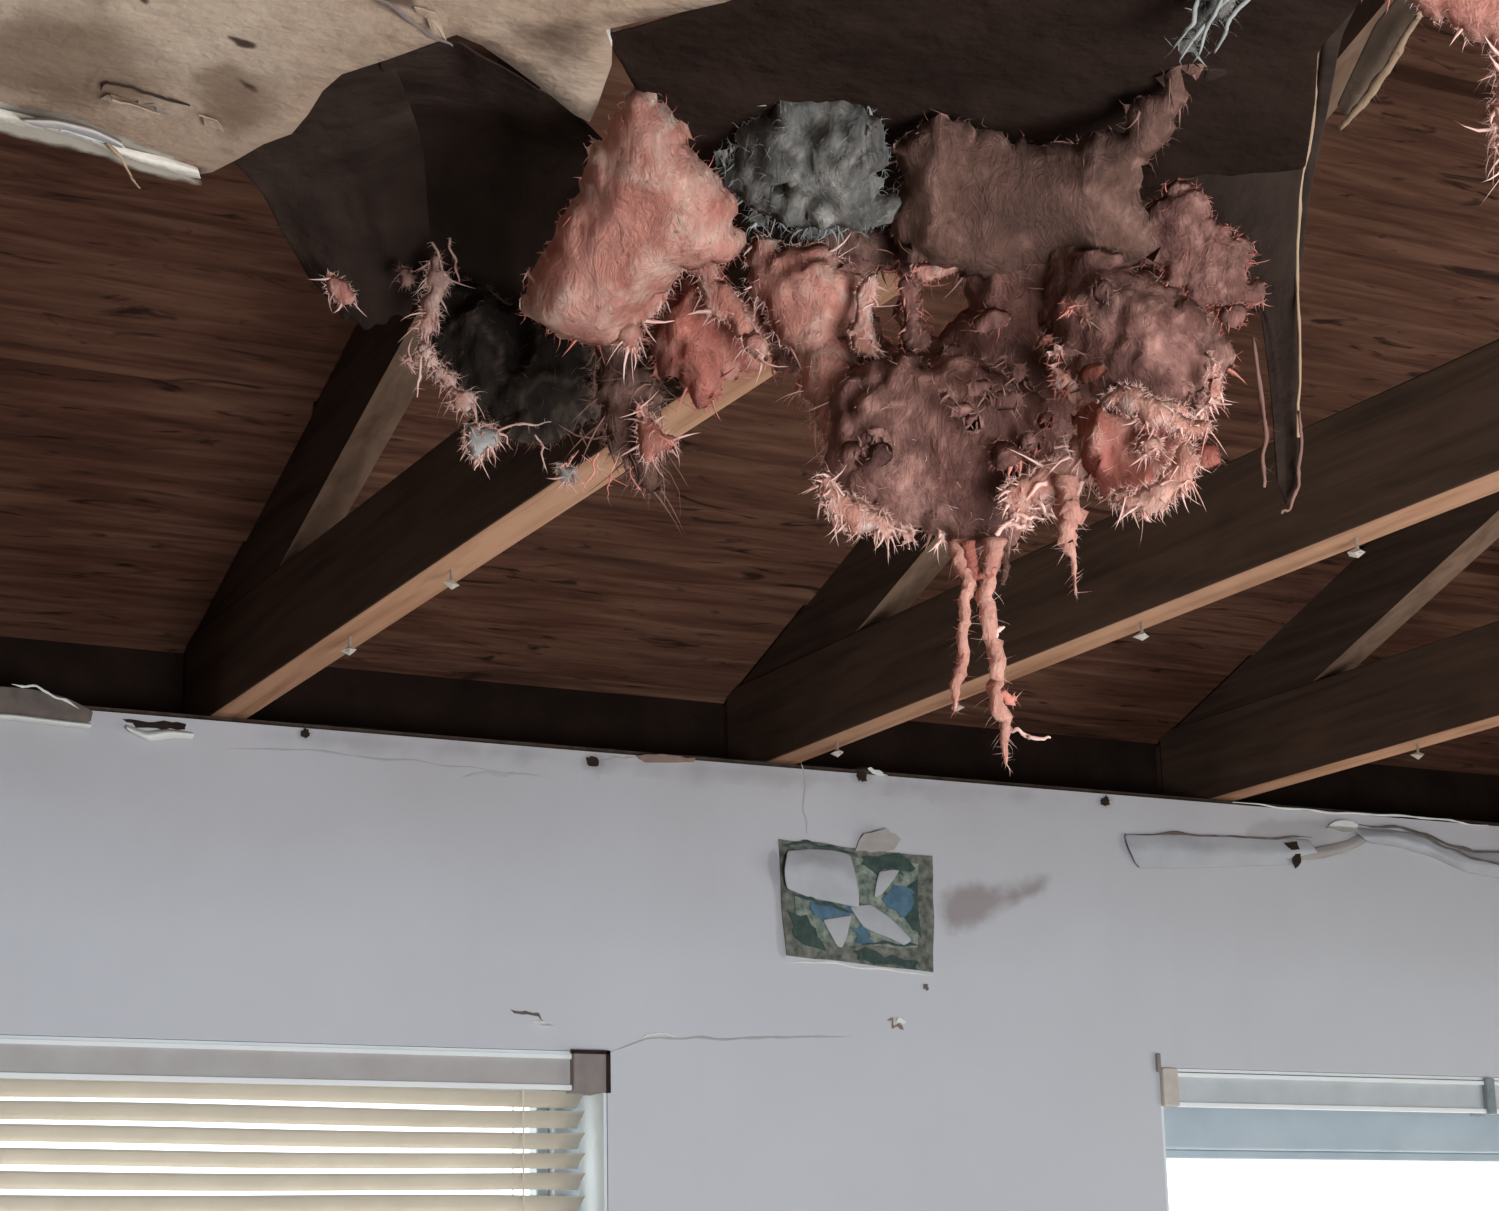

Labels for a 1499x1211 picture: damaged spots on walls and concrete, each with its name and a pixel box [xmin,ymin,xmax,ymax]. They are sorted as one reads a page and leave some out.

peeling [0,684,93,729]
flaking render [123,719,194,741]